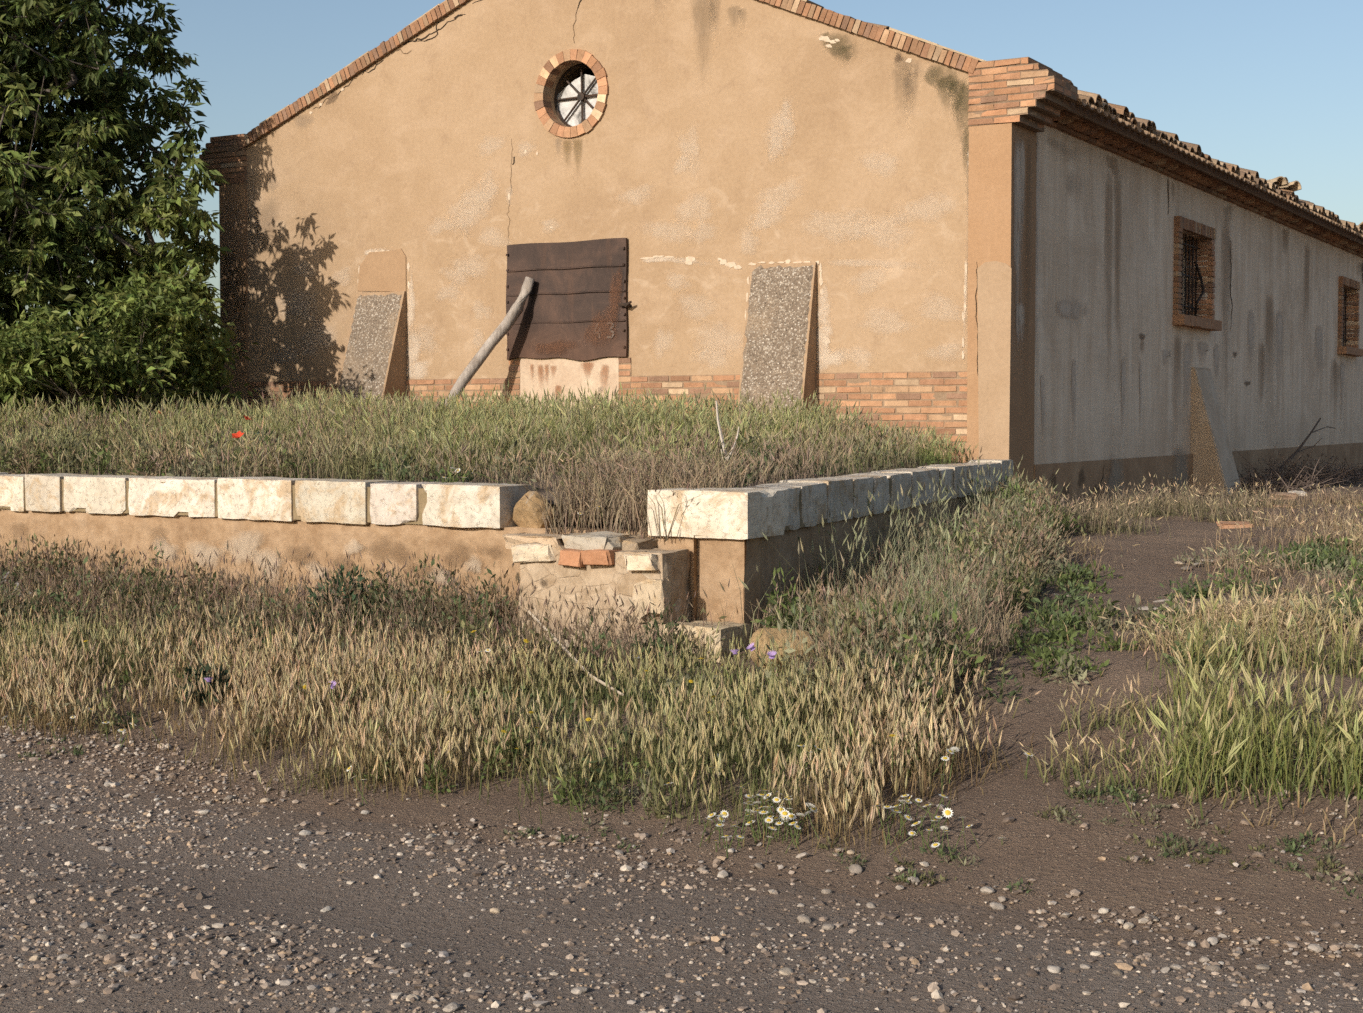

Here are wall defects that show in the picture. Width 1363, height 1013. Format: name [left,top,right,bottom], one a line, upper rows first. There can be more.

crack [315,0,481,108]
crack [507,139,515,244]
peeling [640,255,695,265]